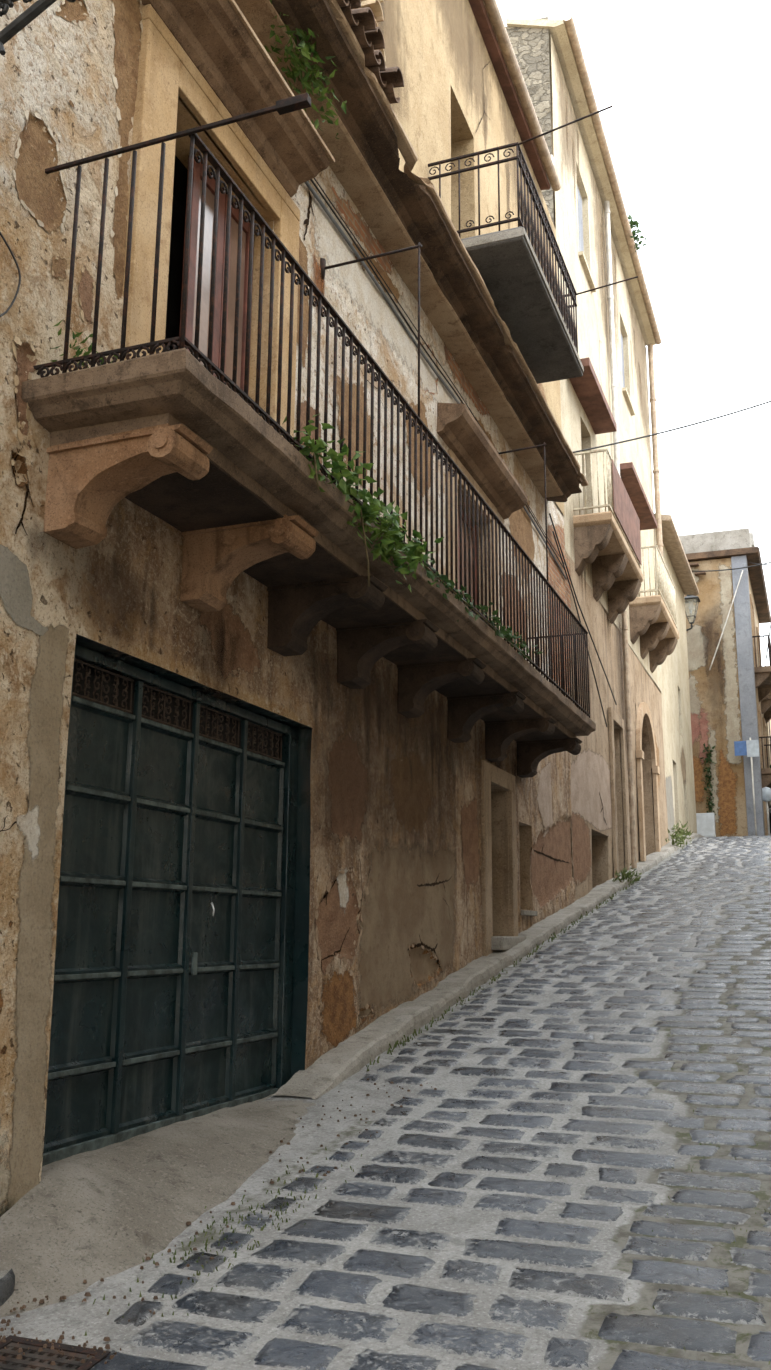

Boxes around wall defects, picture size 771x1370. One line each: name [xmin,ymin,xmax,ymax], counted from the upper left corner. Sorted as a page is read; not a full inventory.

peeling [56,0,89,28]
peeling [12,110,67,235]
peeling [110,0,143,300]
peeling [51,256,96,323]
flaking render [531,812,592,910]
peeling [314,867,375,1049]
crack [408,873,452,971]